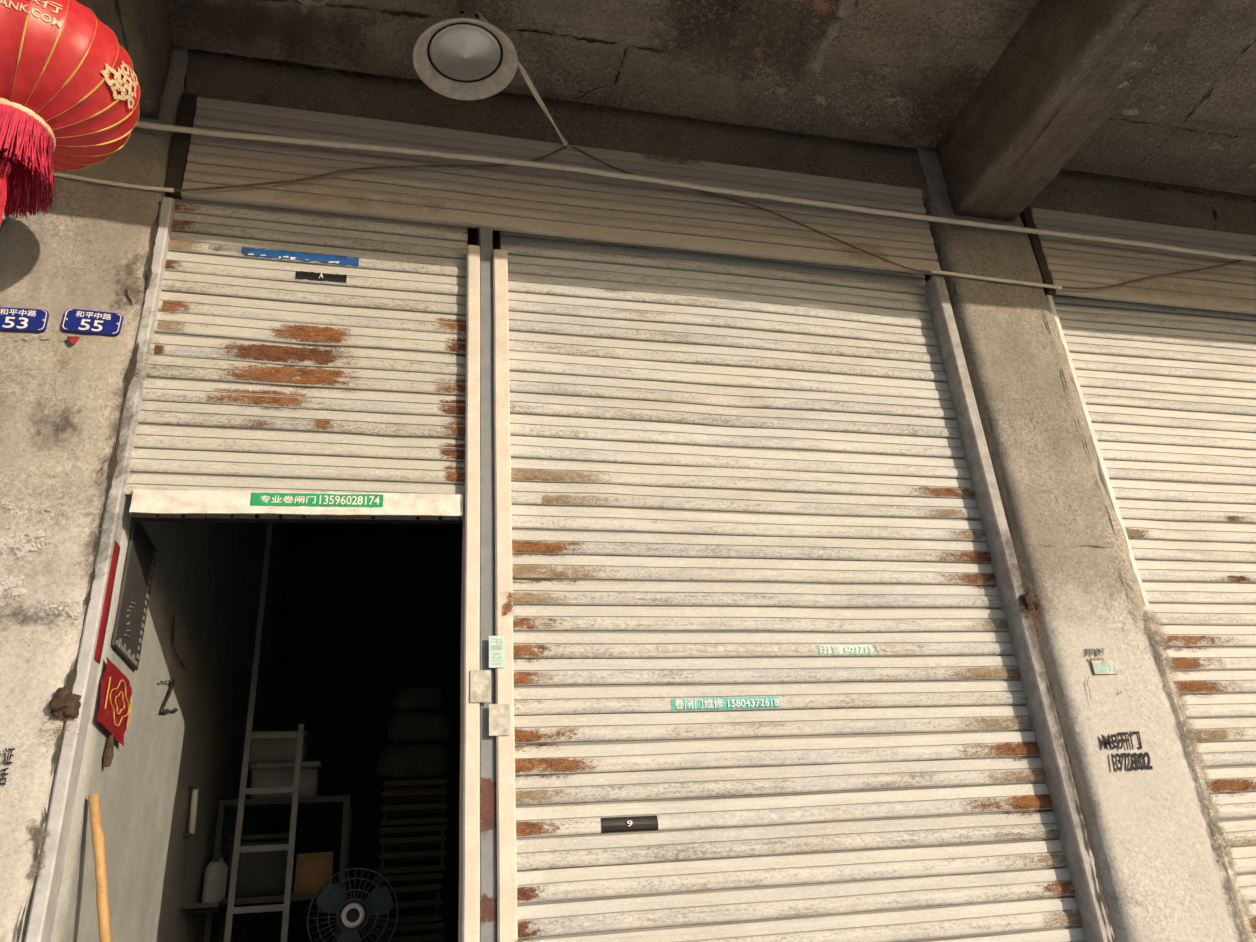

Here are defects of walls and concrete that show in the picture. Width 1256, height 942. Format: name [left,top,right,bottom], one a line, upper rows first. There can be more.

crack [498,26,667,107]
damp [650,0,829,86]
crack [1063,40,1256,230]
corrosion [204,324,360,427]
corrosion [909,487,997,589]
corrosion [502,541,608,629]
corrosion [513,644,560,685]
corrosion [1162,635,1242,699]
corrosion [516,820,560,836]
corrosion [514,728,597,804]
corrosion [958,716,1053,818]
corrosion [1205,779,1256,797]